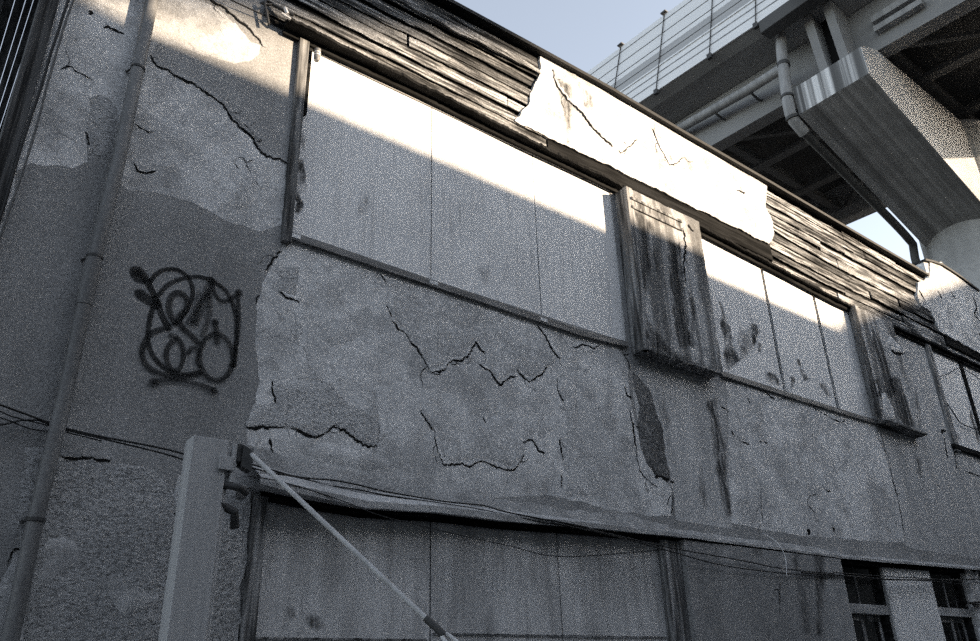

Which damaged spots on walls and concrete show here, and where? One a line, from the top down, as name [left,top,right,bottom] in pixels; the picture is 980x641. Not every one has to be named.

spalling [86,96,117,160]
crack [150,55,288,187]
crack [553,69,693,165]
leakage [719,302,761,364]
crack [246,381,380,453]
crack [387,306,674,513]
spalling [633,373,670,480]
spalling [23,457,181,641]